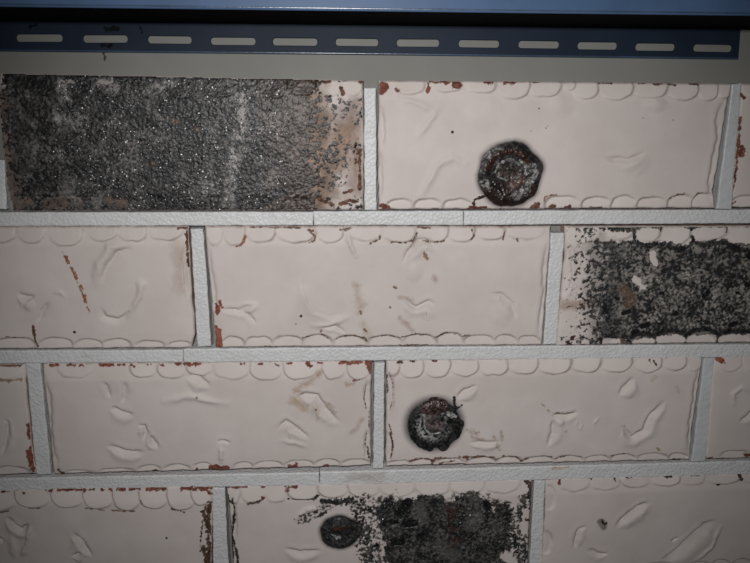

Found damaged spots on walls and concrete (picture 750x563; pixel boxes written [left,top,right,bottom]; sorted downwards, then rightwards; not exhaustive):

spalling [317,149,362,207]
spalling [390,498,424,538]